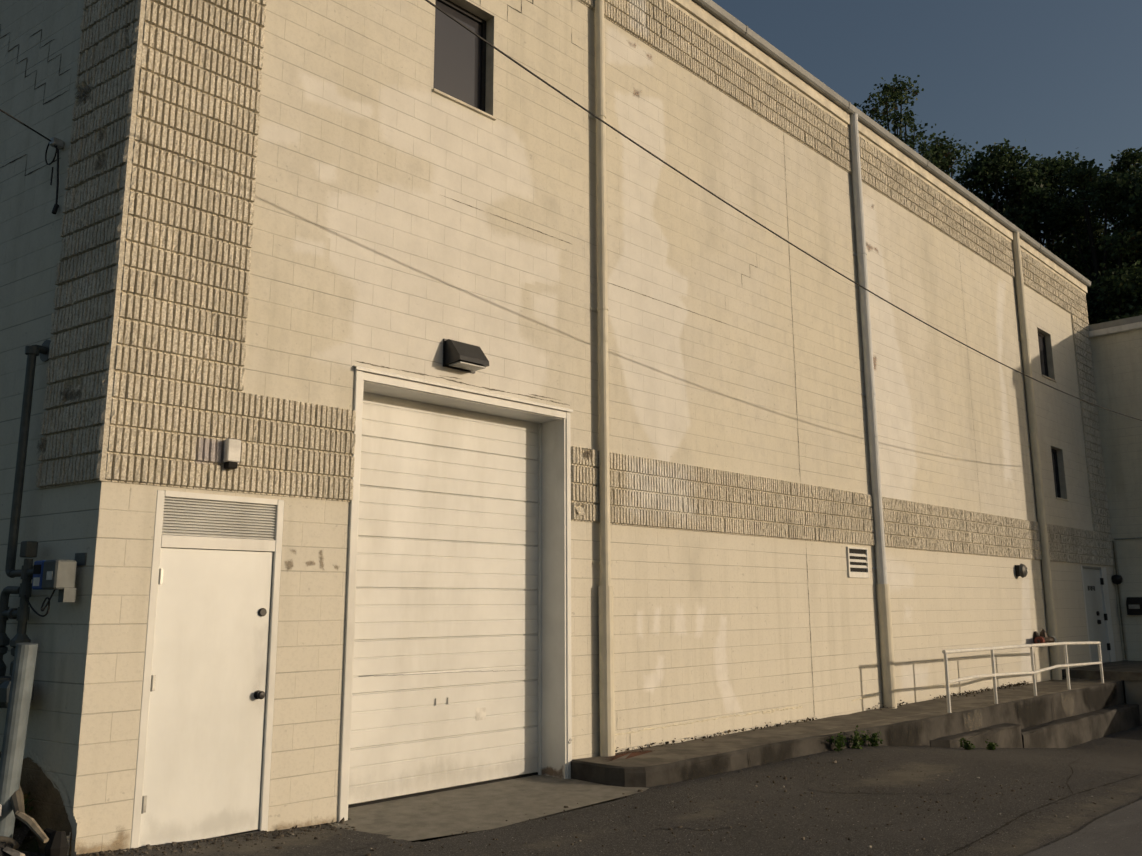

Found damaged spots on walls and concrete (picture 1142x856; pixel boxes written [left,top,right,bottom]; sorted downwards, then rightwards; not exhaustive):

crack [0,24,71,105]
crack [0,154,60,176]
damp [610,453,746,718]